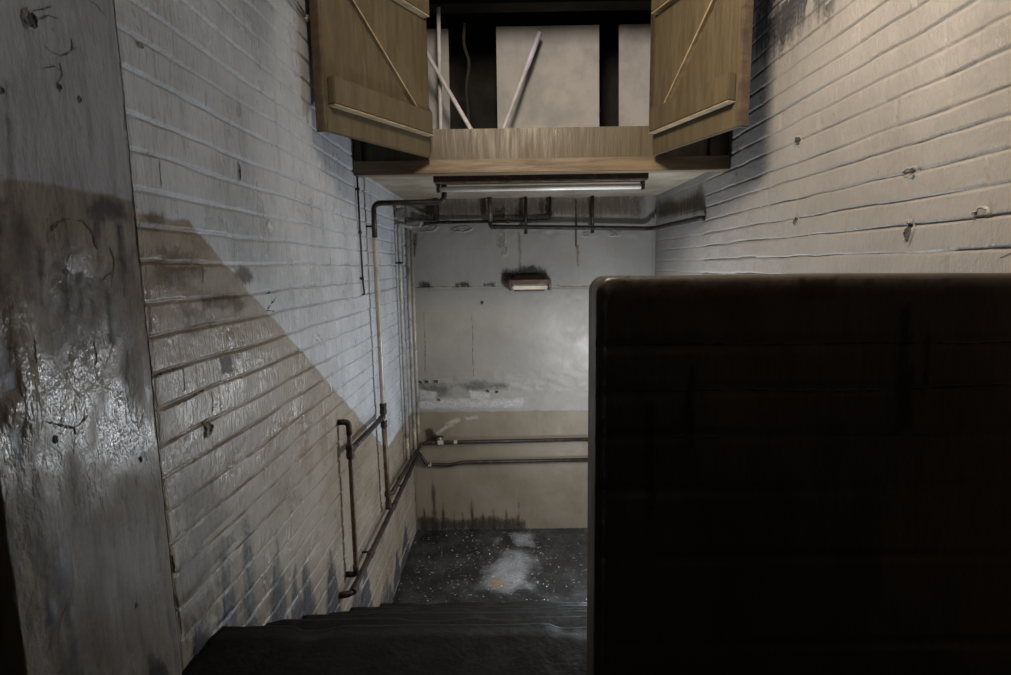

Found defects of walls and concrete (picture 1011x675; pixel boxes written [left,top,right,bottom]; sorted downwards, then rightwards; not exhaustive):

spalling [21,8,39,32]
damp [418,488,525,530]